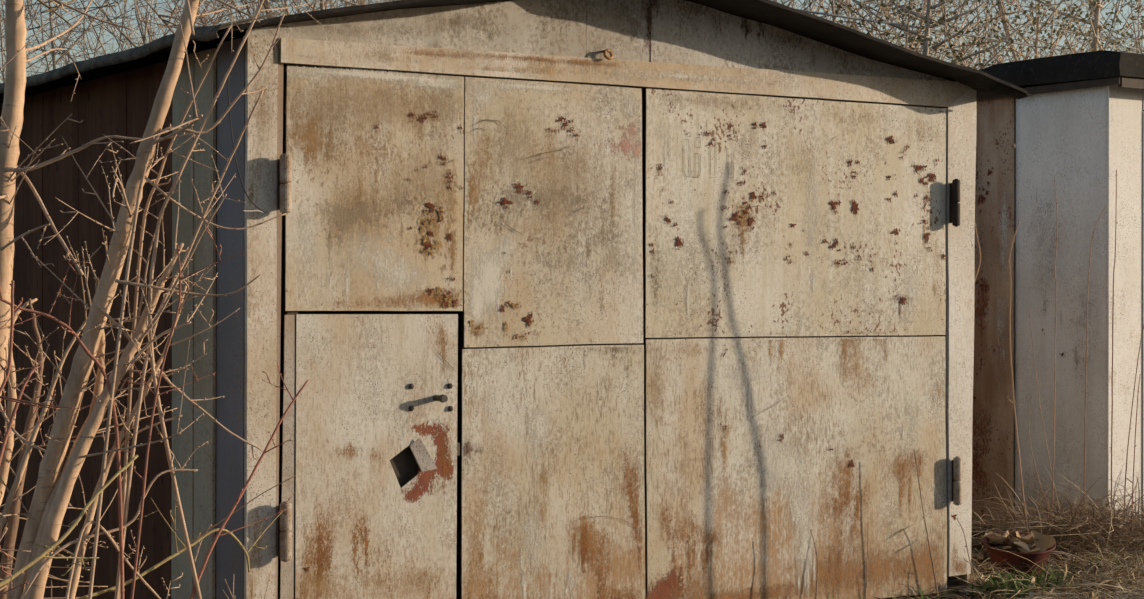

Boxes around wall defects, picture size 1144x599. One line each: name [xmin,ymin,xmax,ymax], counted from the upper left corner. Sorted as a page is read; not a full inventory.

rust [974,268,990,335]
rust [401,420,481,503]
rust [972,403,999,523]
rust [569,451,966,599]